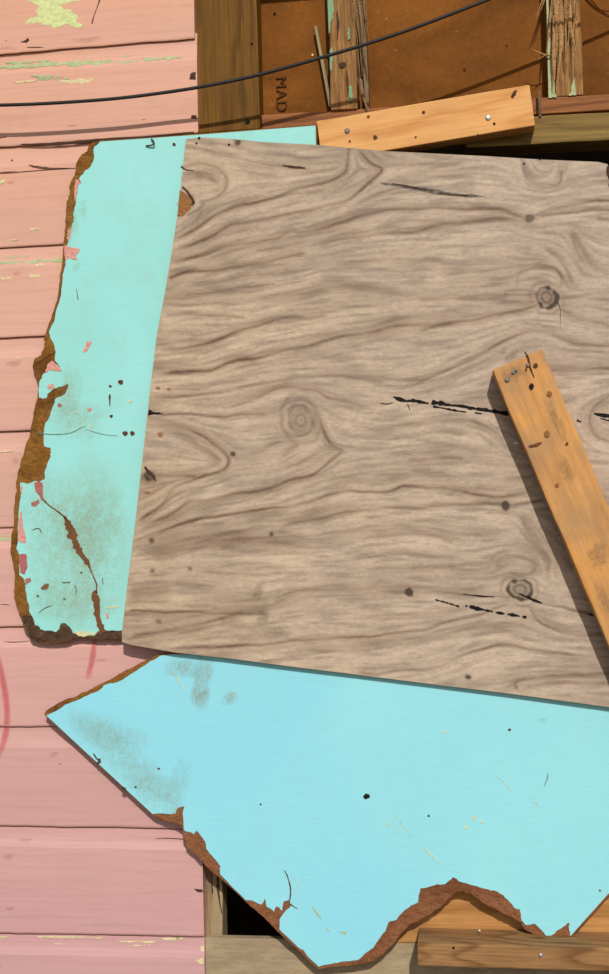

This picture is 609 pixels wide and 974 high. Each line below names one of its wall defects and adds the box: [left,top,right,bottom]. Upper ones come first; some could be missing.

peeling [26,0,82,29]
peeling [0,55,181,84]
spalling [0,141,100,372]
spalling [0,383,122,643]
crack [42,499,106,634]
spalling [153,806,220,876]
spalling [246,900,290,933]
spalling [299,877,570,969]